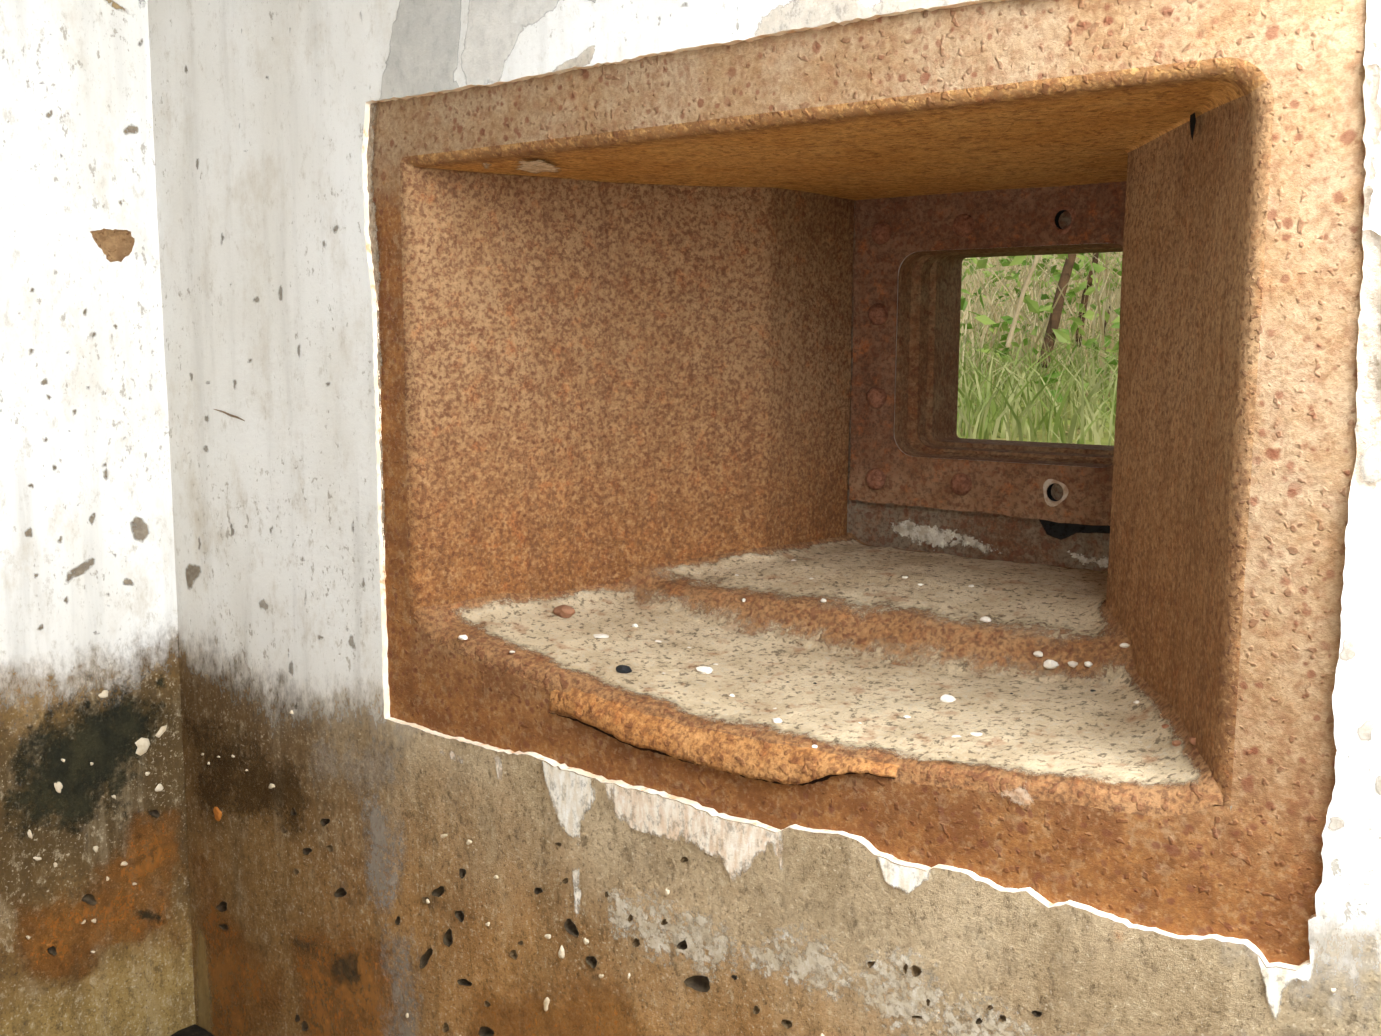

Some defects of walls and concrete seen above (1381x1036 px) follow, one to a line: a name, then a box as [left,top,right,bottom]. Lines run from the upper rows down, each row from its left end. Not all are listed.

peeling [379,0,558,100]
peeling [553,46,595,72]
peeling [754,0,976,37]
spalling [1348,0,1381,502]
crack [551,713,895,786]
damp [0,635,1381,1036]